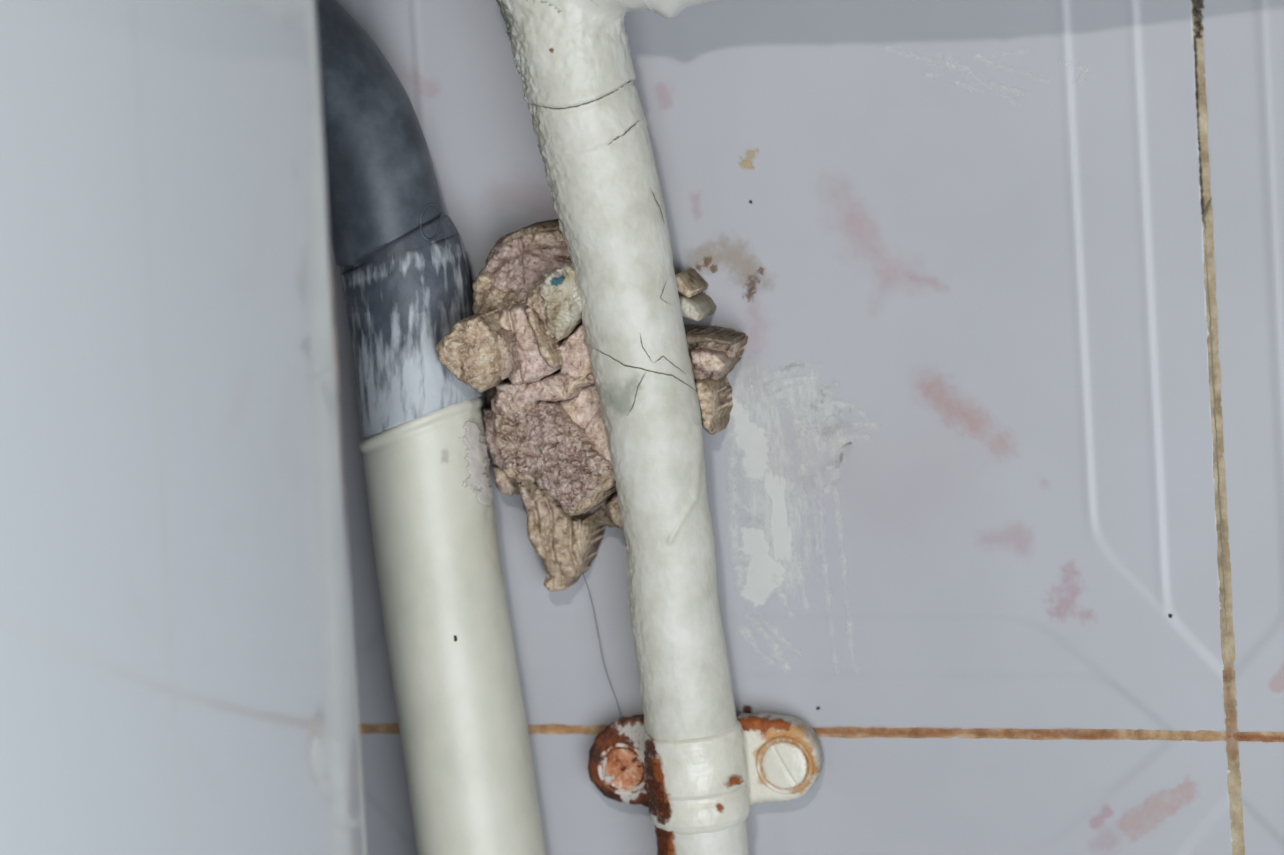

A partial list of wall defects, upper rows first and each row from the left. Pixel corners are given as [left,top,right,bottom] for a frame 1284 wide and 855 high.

crack [588,335,696,411]
rust [738,706,819,793]
rust [644,738,675,855]